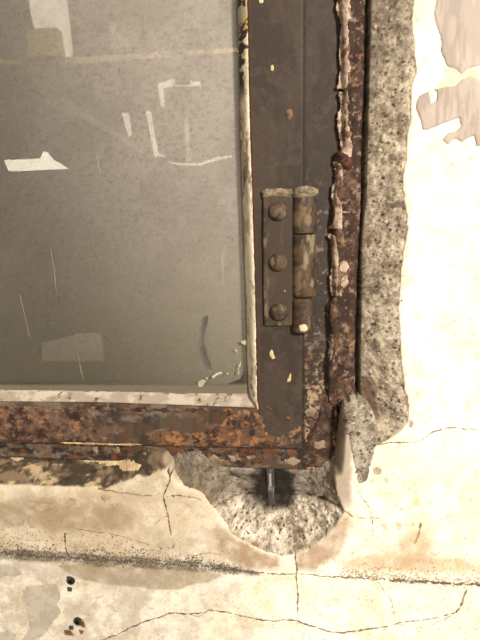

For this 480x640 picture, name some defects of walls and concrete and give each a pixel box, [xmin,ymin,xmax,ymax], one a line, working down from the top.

spalling [327,0,480,483]
corrosion [0,405,216,457]
corrosion [147,395,336,468]
crack [378,427,476,445]
crack [136,468,185,548]
flaking render [172,449,343,556]
crack [1,527,149,563]
water stain [0,531,278,586]
crack [103,552,480,640]
water stain [298,545,334,568]
water stain [393,567,480,588]